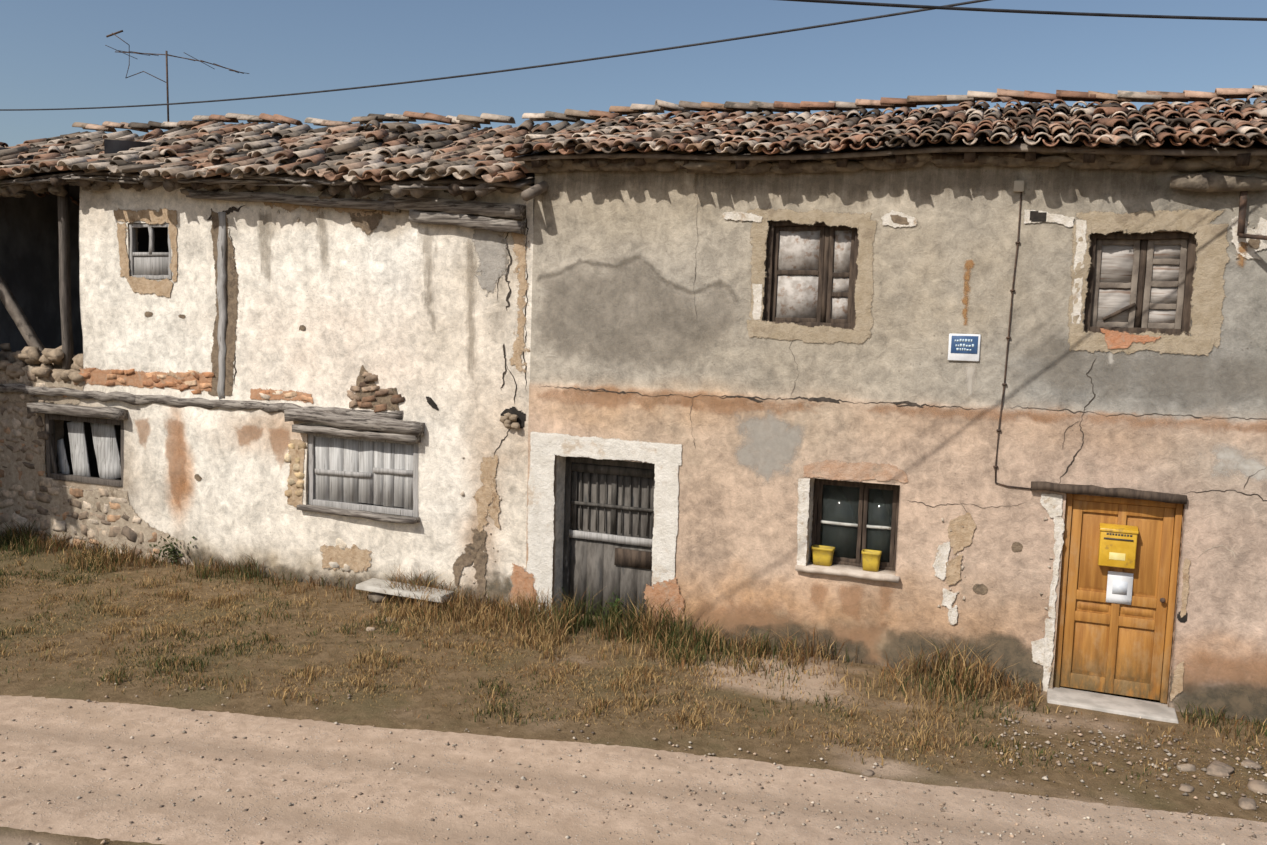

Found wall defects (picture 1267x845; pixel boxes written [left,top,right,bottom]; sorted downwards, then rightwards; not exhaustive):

spalling [1230,216,1267,260]
crack [494,202,1263,482]
spalling [1098,328,1161,364]
crack [1182,467,1267,501]
flaking render [452,455,502,600]
spalling [320,538,372,572]
spalling [508,564,540,608]
flaking render [932,512,988,625]
flaking render [1031,493,1065,691]